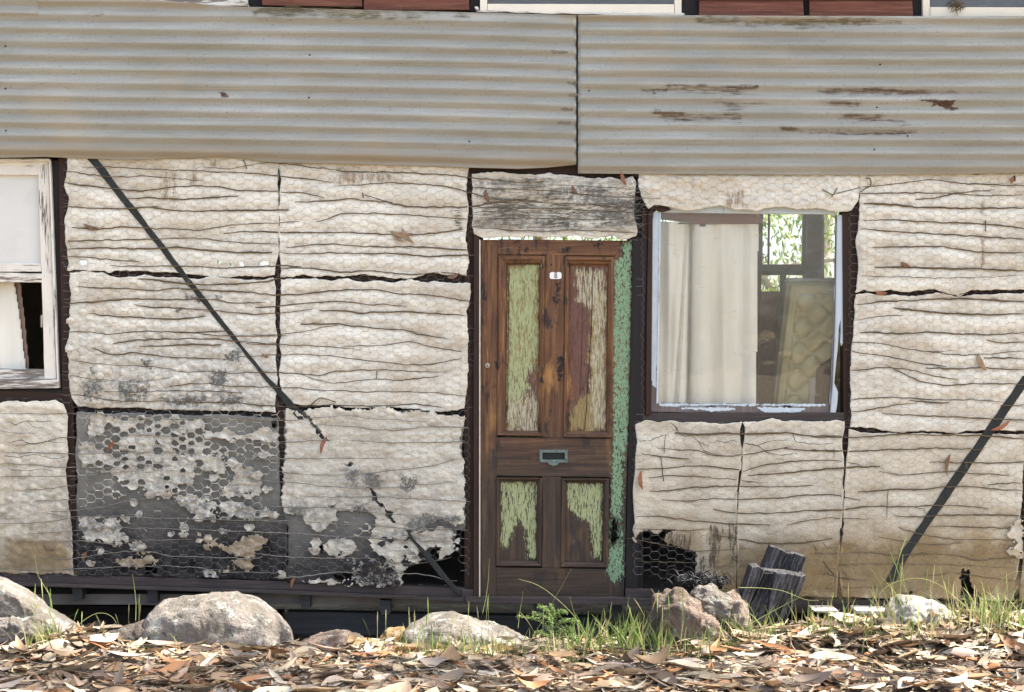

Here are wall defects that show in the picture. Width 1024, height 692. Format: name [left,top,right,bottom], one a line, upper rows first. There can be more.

corrosion [821,88,958,135]
mould [82,359,152,403]
mould [160,348,243,410]
peeling [506,264,539,437]
flaking render [77,405,466,588]
peeling [500,482,537,560]
crack [644,422,848,596]